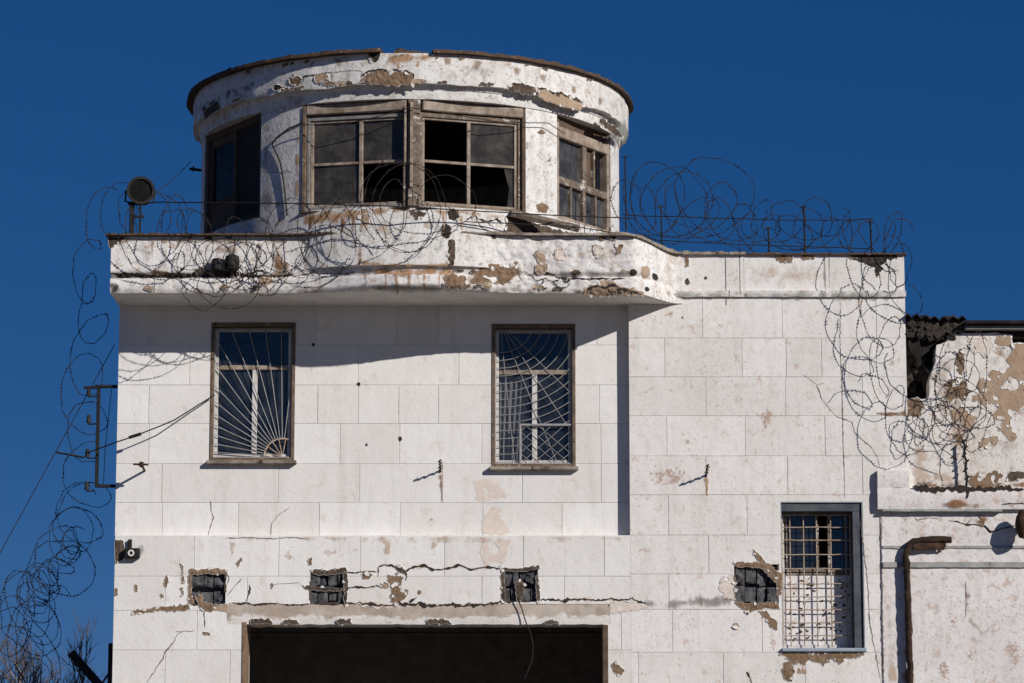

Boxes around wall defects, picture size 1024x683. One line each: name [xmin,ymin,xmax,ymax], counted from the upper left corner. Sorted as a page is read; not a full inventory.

spalling [271,54,448,92]
spalling [507,83,585,111]
spalling [442,248,581,292]
spalling [579,265,651,298]
flaking render [945,334,1024,451]
flaking render [968,470,1024,488]
crack [208,501,306,539]
crack [912,484,1024,533]
spalling [362,564,421,607]
crack [347,563,505,609]
crack [148,569,308,681]
spalling [718,549,865,682]